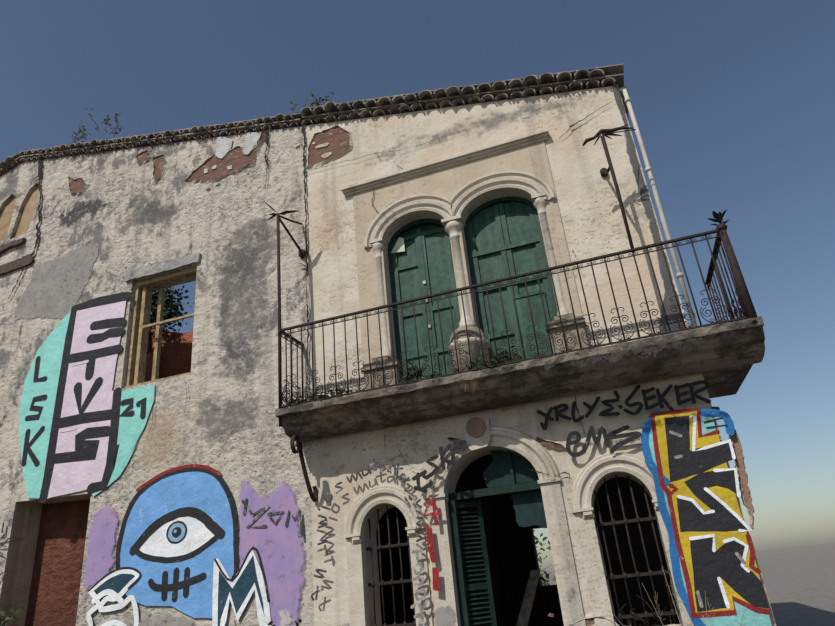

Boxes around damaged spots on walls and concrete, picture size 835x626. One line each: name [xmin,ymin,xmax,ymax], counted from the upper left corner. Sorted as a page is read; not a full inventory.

spalling [135,149,168,184]
spalling [185,127,272,191]
spalling [296,124,354,169]
crack [301,124,481,389]
damp [218,218,277,381]